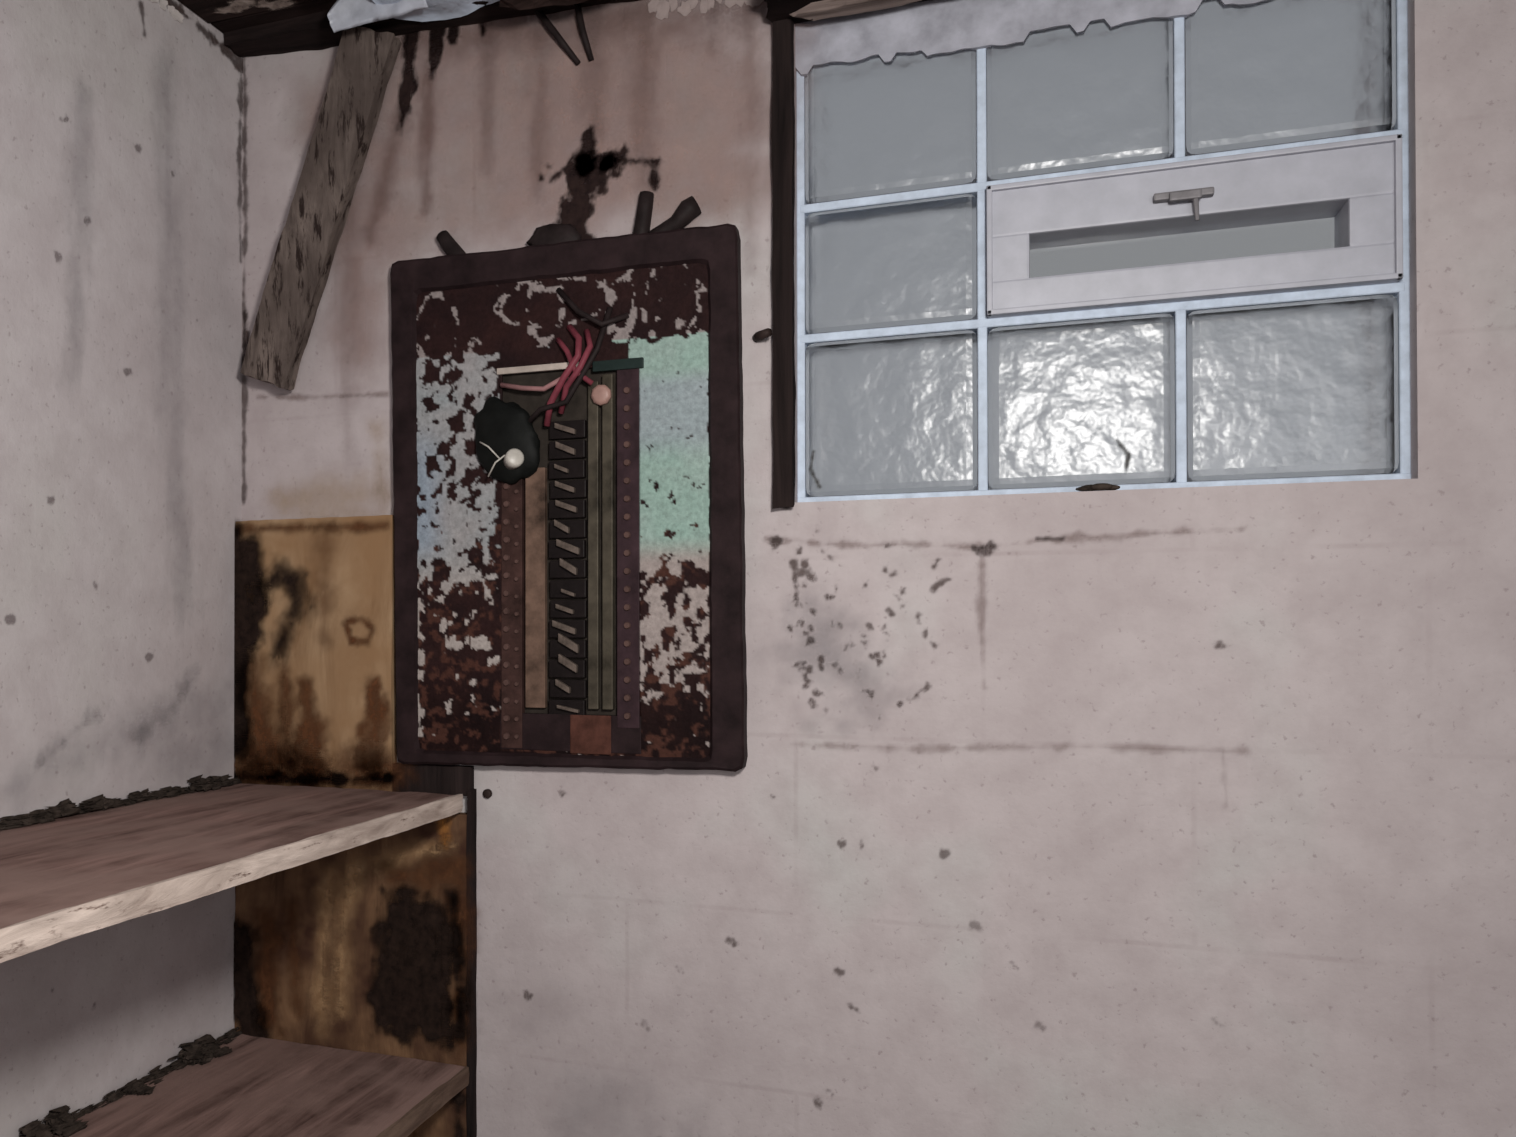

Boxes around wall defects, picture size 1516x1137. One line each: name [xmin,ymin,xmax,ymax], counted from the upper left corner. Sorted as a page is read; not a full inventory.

peeling [150,0,184,23]
peeling [216,0,293,13]
water stain [391,26,459,134]
water stain [467,19,748,240]
water stain [790,548,814,600]
water stain [788,595,834,706]